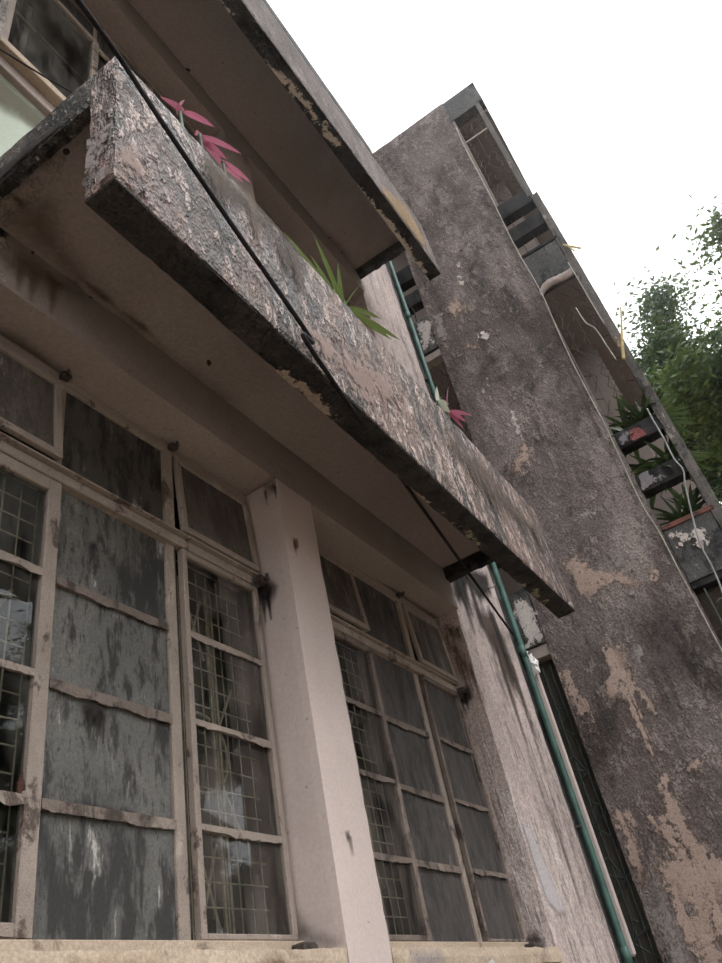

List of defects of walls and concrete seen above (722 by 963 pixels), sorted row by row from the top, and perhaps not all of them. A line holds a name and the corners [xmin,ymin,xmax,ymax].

spalling [274,367,340,422]
peeling [296,312,405,415]
leakage [453,571,528,736]
peeling [513,581,549,649]
peeling [558,670,599,734]
peeling [562,553,660,597]
peeling [601,643,660,757]
peeling [612,770,722,963]